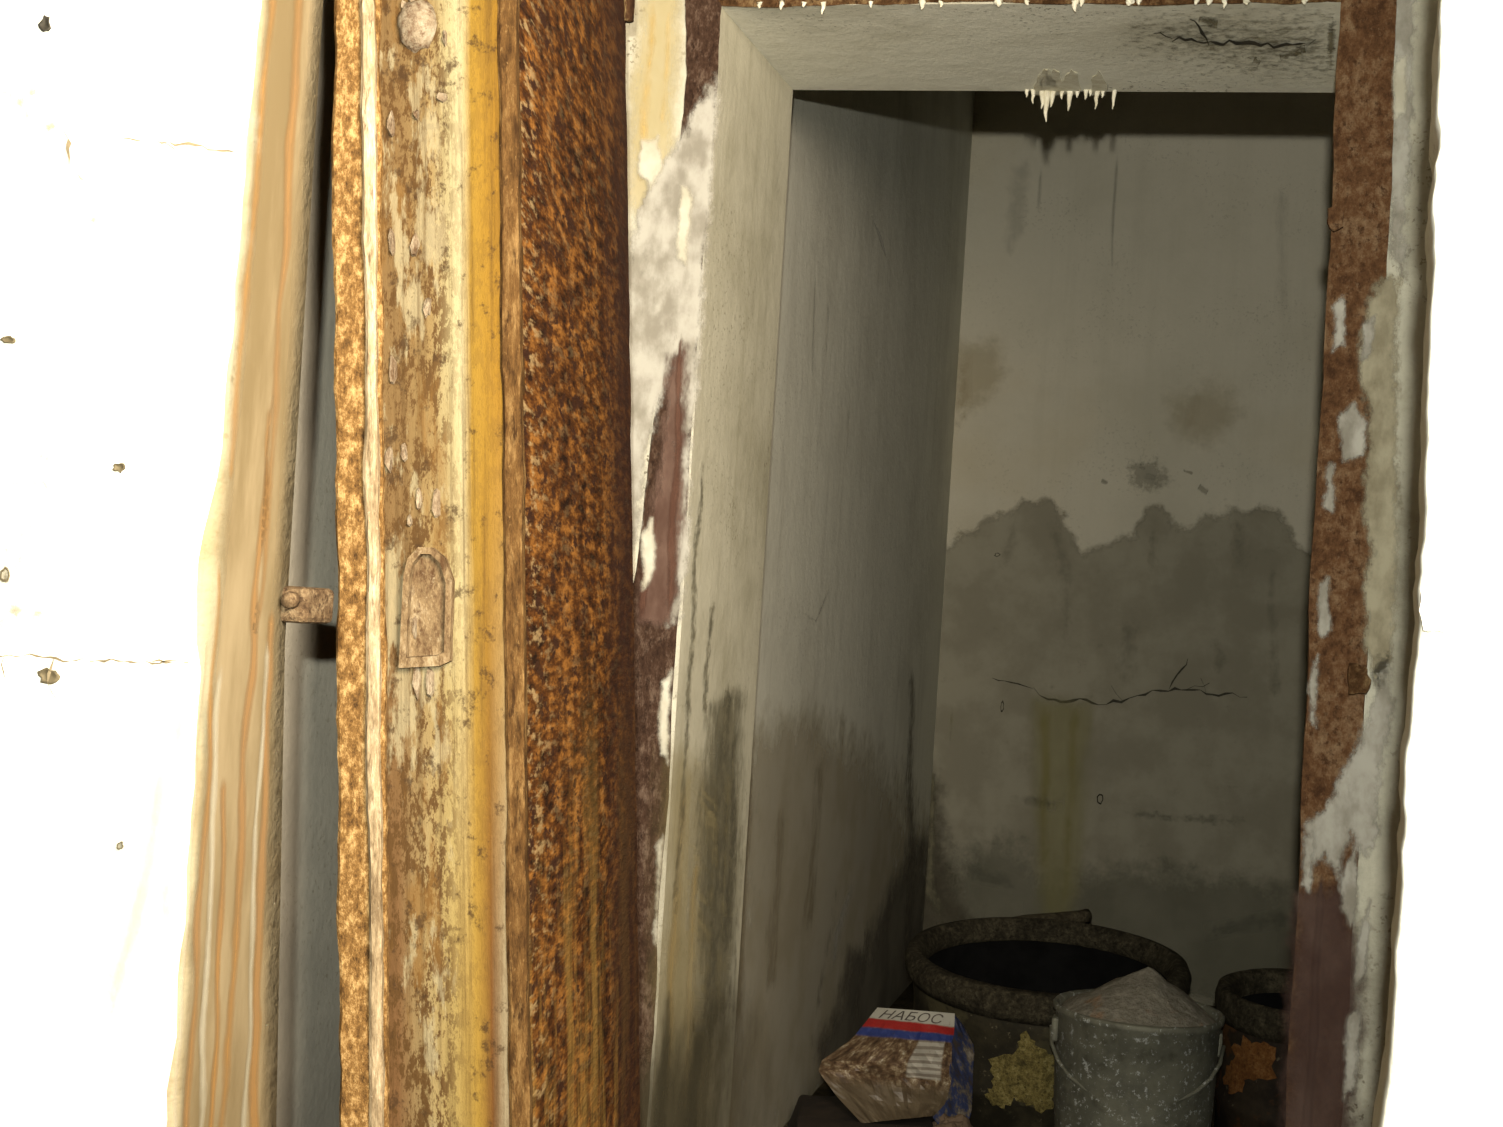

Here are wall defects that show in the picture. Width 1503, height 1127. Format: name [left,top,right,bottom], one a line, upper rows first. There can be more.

peeling [629,80,720,626]
peeling [1301,0,1415,985]
peeling [659,676,671,756]
crack [993,659,1239,705]
water stain [640,479,1311,1127]
peeling [653,839,663,944]
peeling [1343,1007,1361,1099]